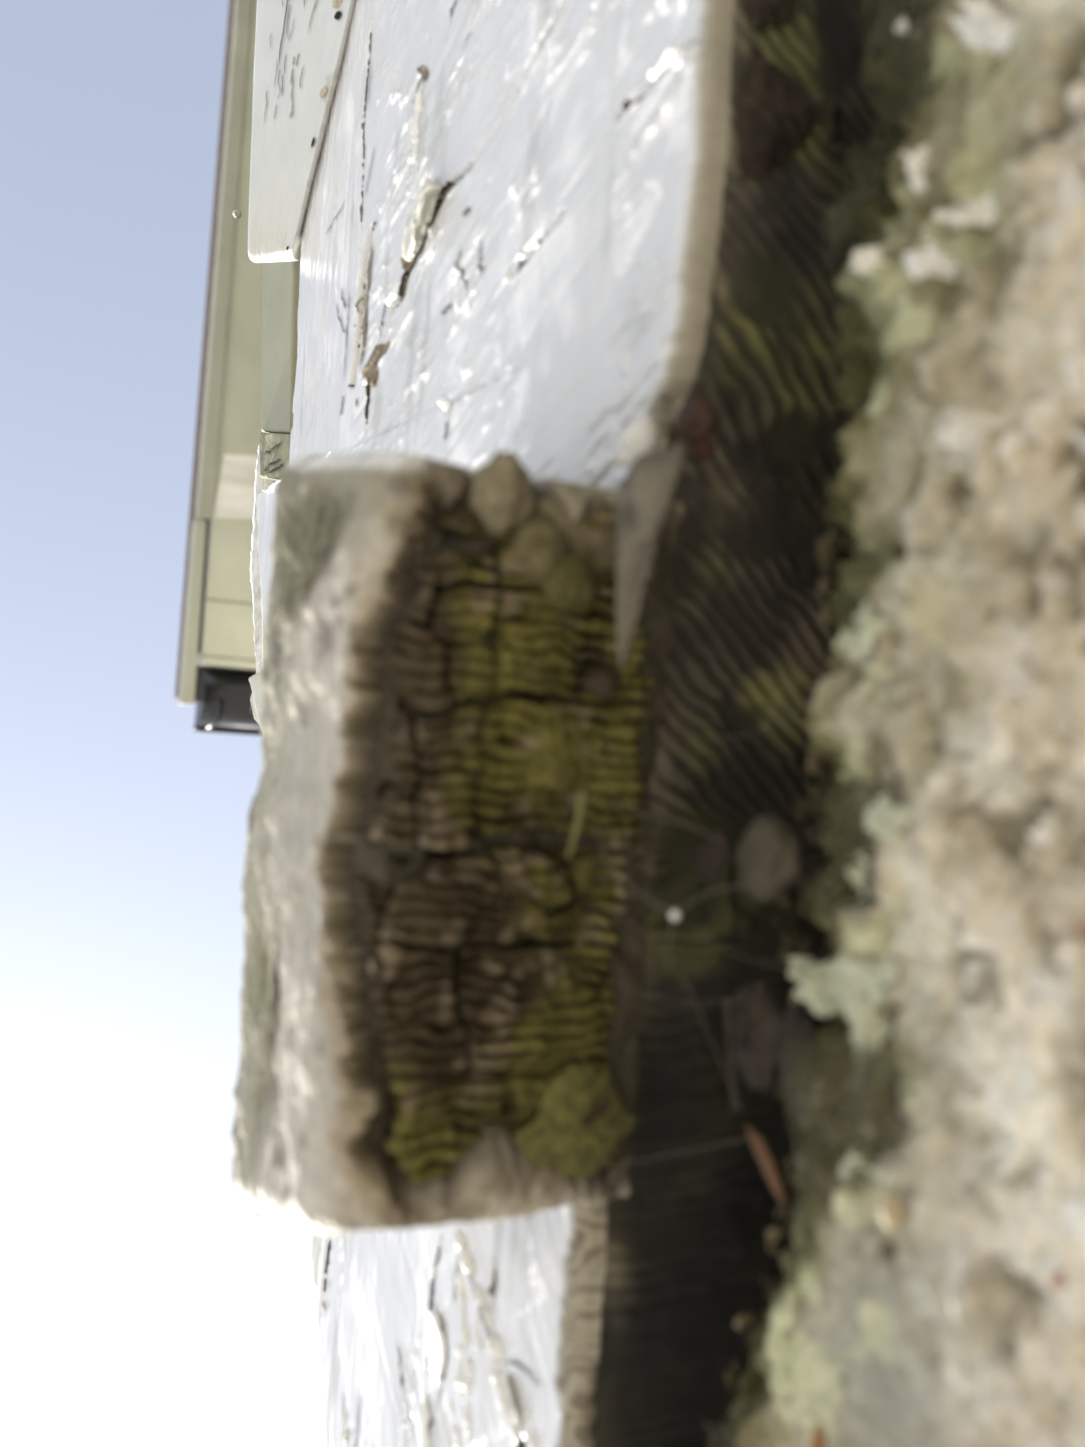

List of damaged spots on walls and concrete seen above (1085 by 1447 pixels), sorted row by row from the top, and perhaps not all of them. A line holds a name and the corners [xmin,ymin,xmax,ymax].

peeling [339,175,465,424]
leakage [276,494,343,624]
leakage [246,902,275,1145]